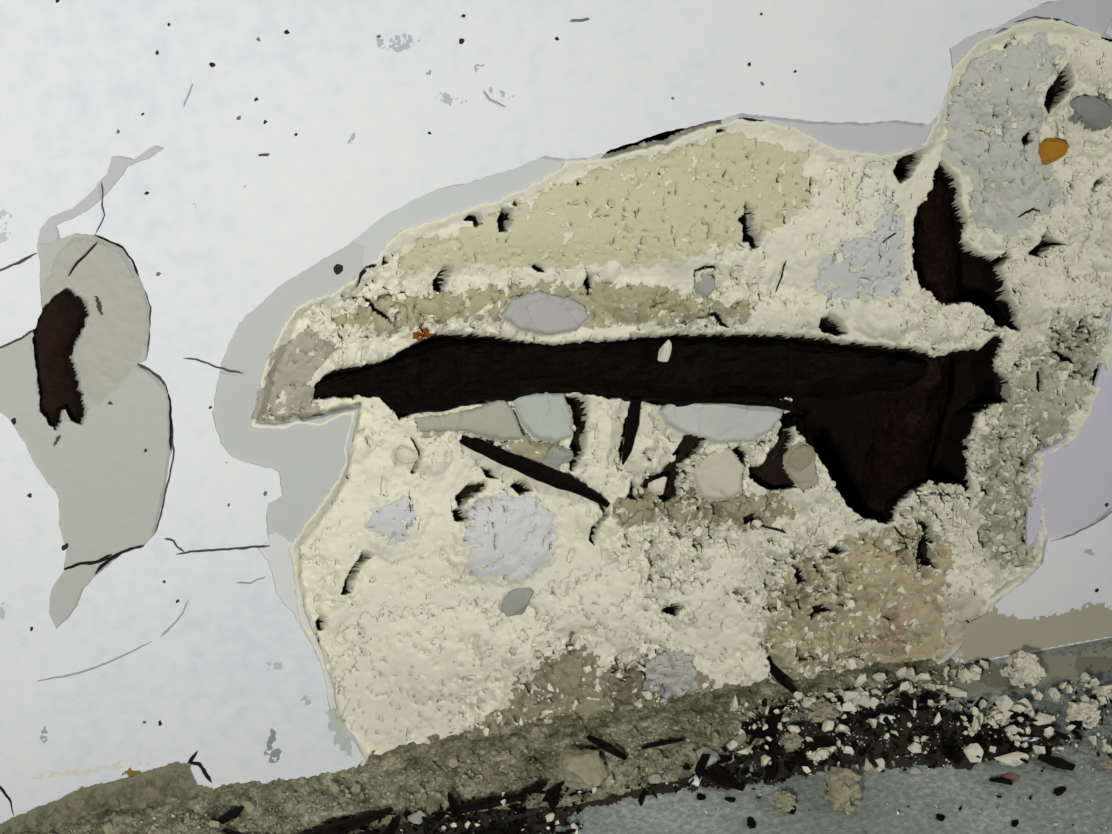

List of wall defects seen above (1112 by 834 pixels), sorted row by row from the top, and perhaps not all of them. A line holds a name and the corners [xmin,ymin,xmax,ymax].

crack [1014,16,1077,26]
crack [0,253,37,271]
crack [0,329,34,349]
corrosion [412,327,433,341]
corrosion [33,289,103,446]
peeling [0,146,174,627]
spalling [212,0,1112,766]
crack [1050,511,1112,542]
crack [36,600,189,682]
crack [188,751,212,783]
crack [0,786,14,815]